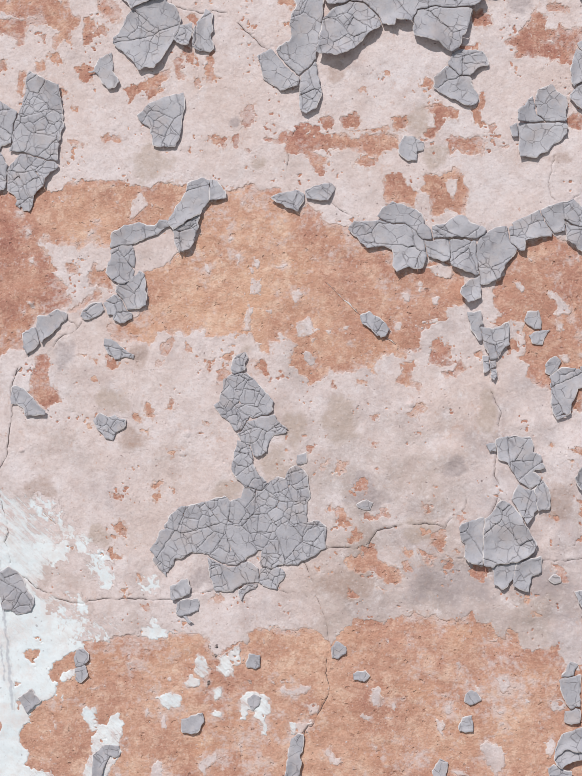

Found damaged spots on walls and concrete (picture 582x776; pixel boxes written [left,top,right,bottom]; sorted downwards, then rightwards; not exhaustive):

flaking render [0,0,582,617]
flaking render [16,578,582,776]